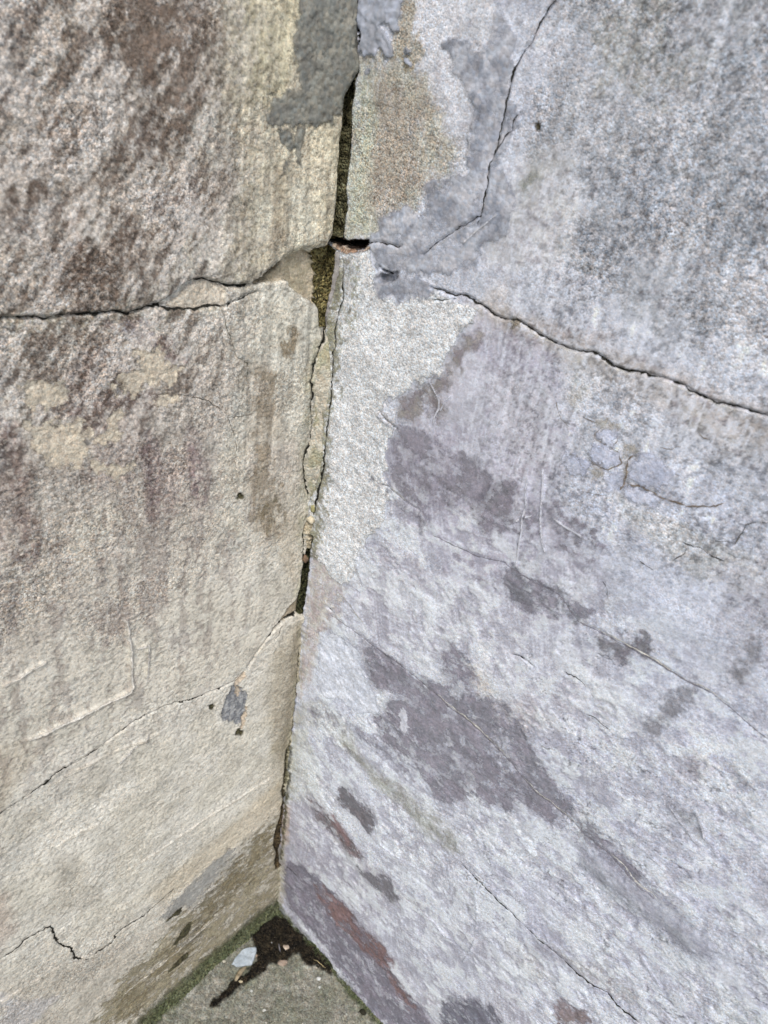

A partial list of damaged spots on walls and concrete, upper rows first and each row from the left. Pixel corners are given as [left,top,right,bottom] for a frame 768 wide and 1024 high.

crack [427,0,556,252]
crack [302,282,344,555]
leakage [391,332,543,538]
leakage [553,501,606,554]
crack [434,288,767,415]
crack [0,746,101,814]
crack [0,887,176,960]
crack [275,651,299,879]
leakage [89,800,502,1024]
leakage [337,787,375,834]
leakage [357,645,645,880]